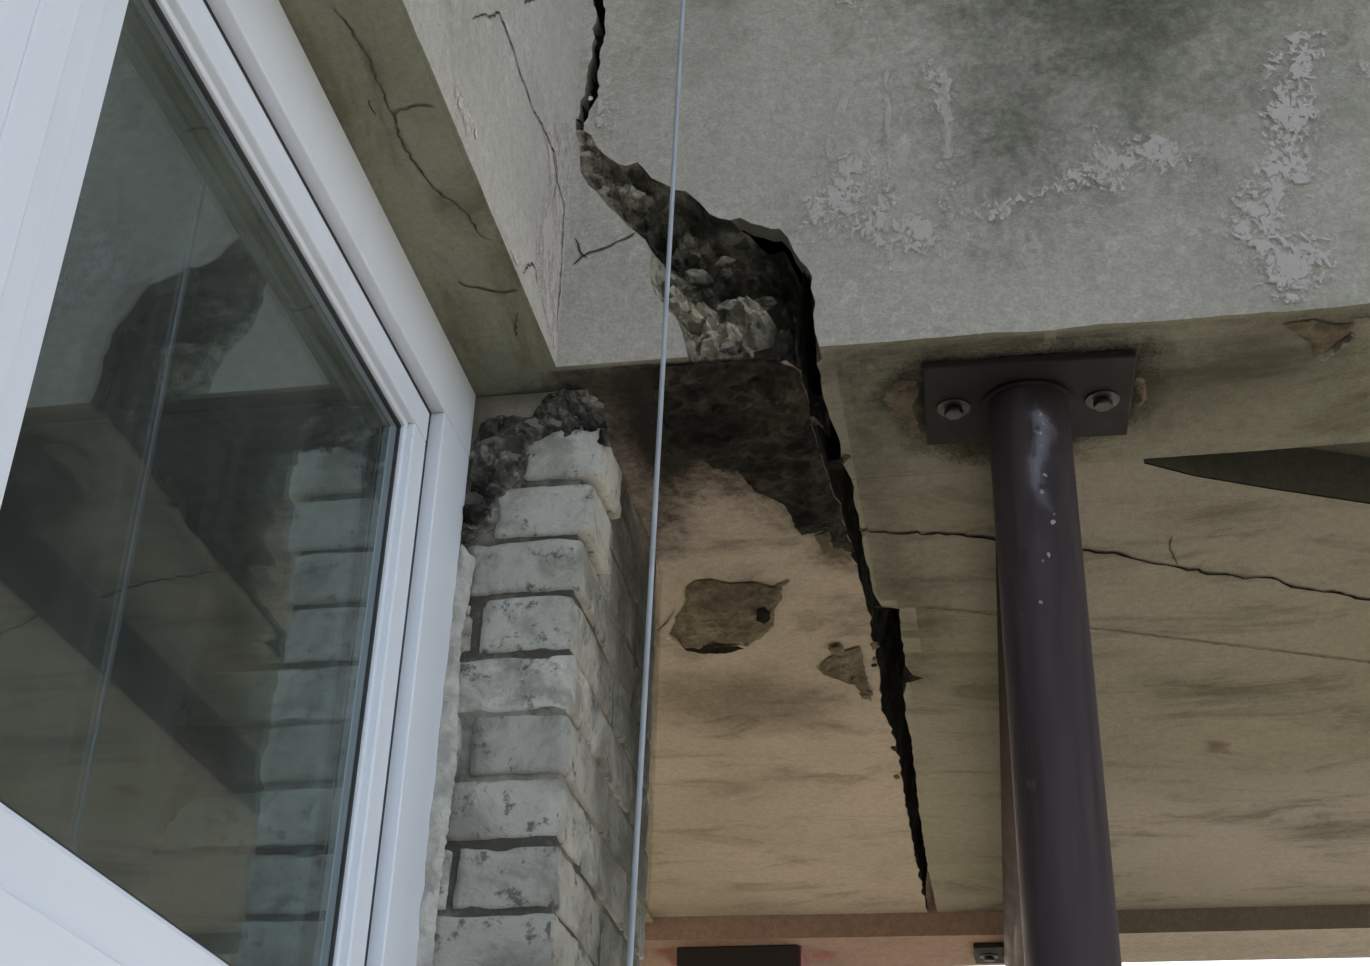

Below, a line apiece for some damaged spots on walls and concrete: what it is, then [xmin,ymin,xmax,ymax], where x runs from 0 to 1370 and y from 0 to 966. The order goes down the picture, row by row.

crack [334,9,491,240]
crack [457,0,635,337]
peeling [1225,23,1339,303]
spalling [536,95,850,559]
spalling [460,389,610,544]
leakage [564,356,843,761]
spalling [658,580,790,654]
spalling [818,643,873,702]
crack [795,271,997,897]
crack [1083,536,1370,601]
crack [1090,628,1370,664]